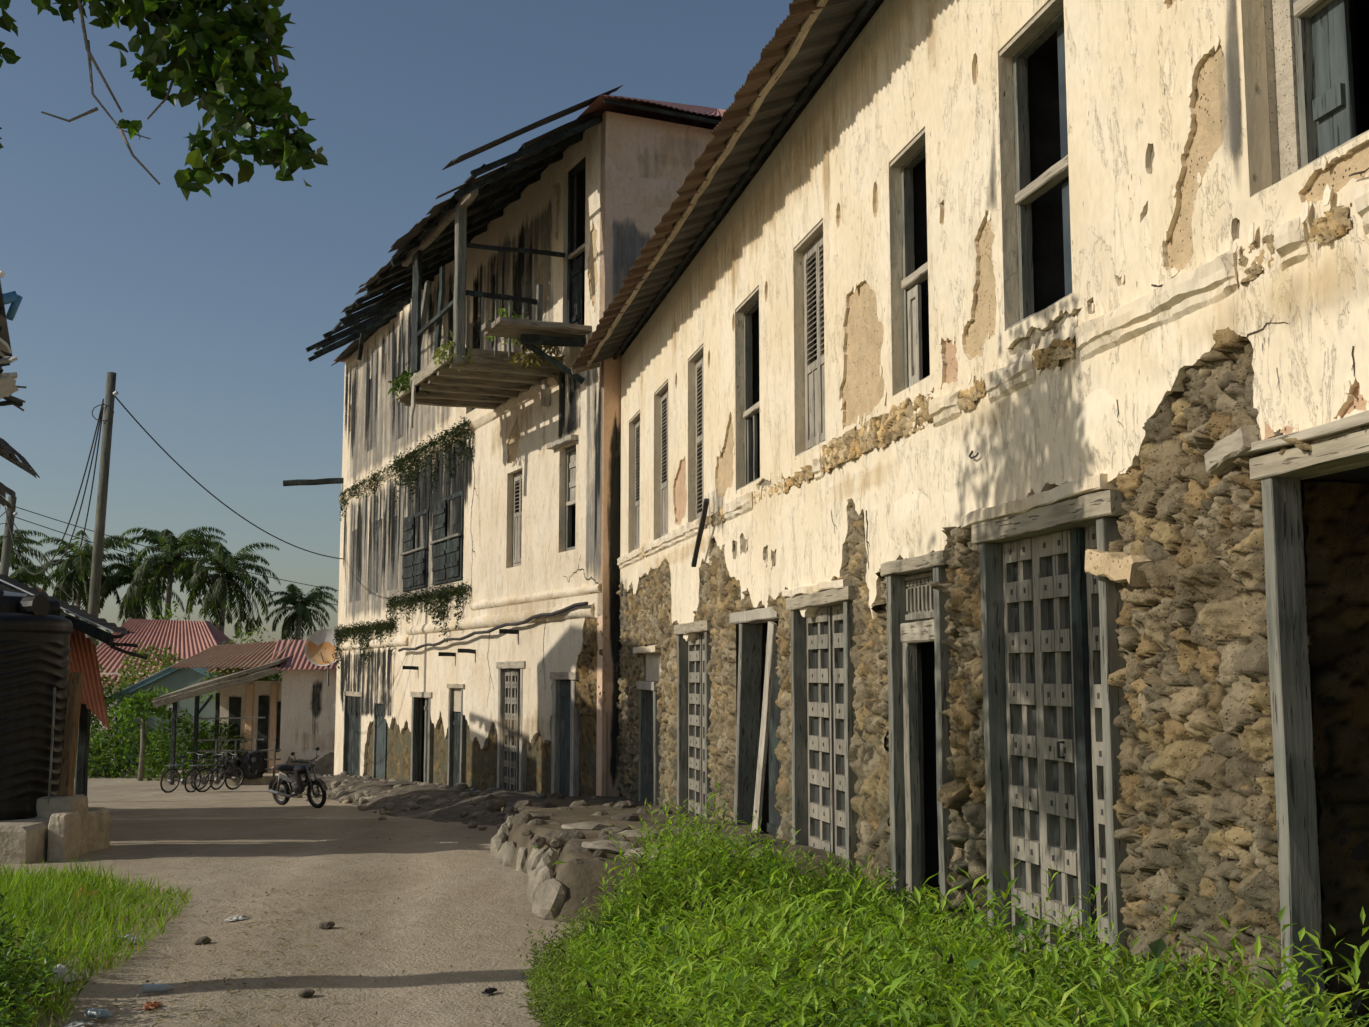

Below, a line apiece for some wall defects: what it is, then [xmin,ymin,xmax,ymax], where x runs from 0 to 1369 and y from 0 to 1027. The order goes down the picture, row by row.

flaking render [1164,35,1227,270]
leakage [1222,0,1239,160]
flaking render [1300,144,1369,224]
leakage [473,202,553,353]
flaking render [840,281,887,434]
flaking render [929,209,997,403]
leakage [343,274,471,621]